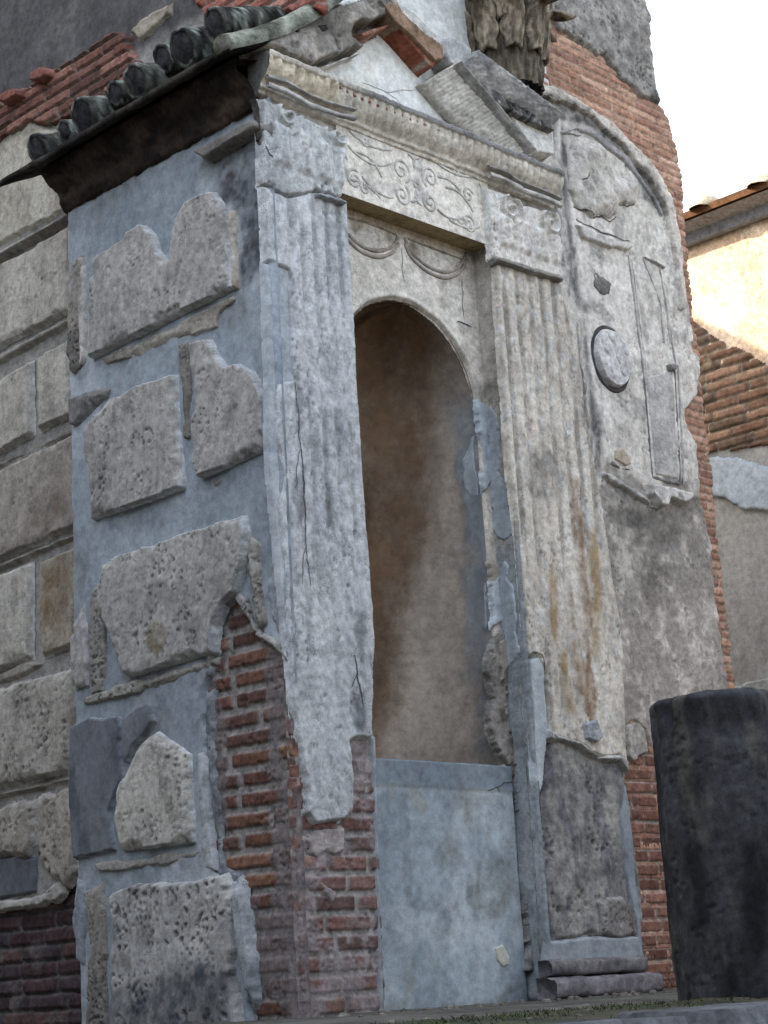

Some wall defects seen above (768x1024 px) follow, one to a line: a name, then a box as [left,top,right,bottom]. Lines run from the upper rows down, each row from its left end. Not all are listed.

crack [295,383,311,585]
spalling [205,593,385,1021]
crack [352,655,364,709]
spalling [540,719,677,989]